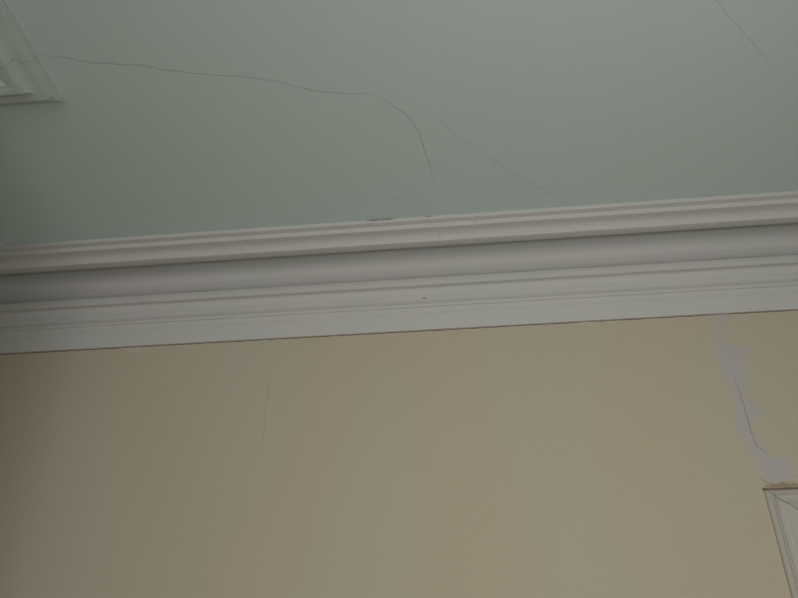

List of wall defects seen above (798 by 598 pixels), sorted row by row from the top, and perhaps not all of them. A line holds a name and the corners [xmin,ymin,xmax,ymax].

crack [0,56,349,94]
crack [762,479,798,510]